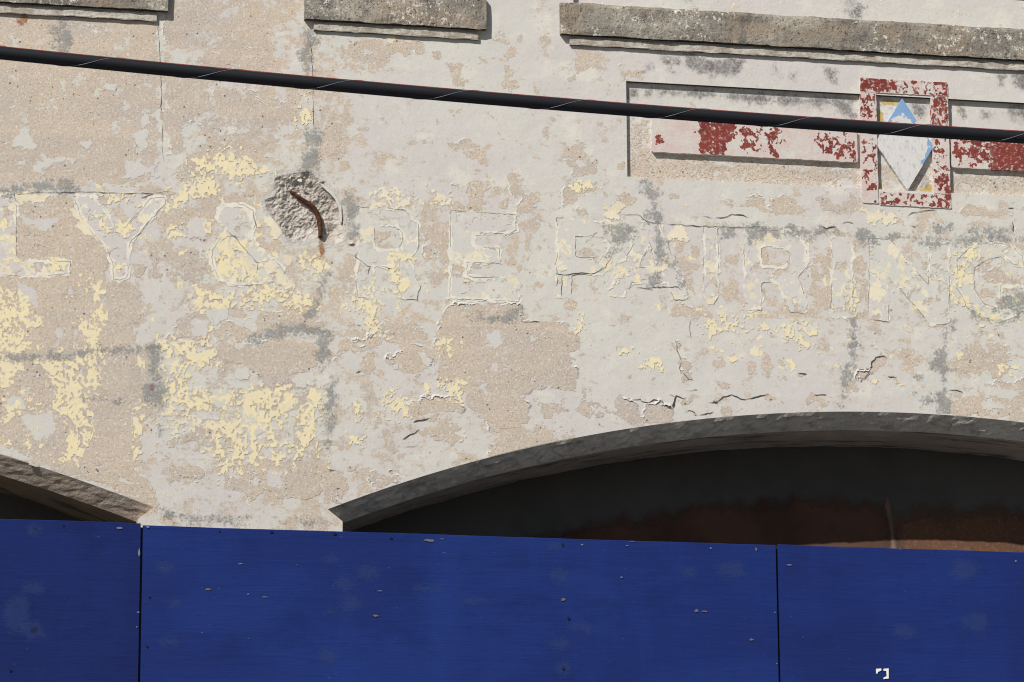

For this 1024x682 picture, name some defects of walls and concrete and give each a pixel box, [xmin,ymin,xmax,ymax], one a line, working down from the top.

peeling [0,0,291,72]
peeling [860,78,948,123]
peeling [617,118,1024,226]
peeling [0,60,700,514]
crack [628,326,767,417]
peeling [659,225,822,389]
peeling [808,247,869,317]
peeling [852,354,906,392]
peeling [927,241,1024,421]